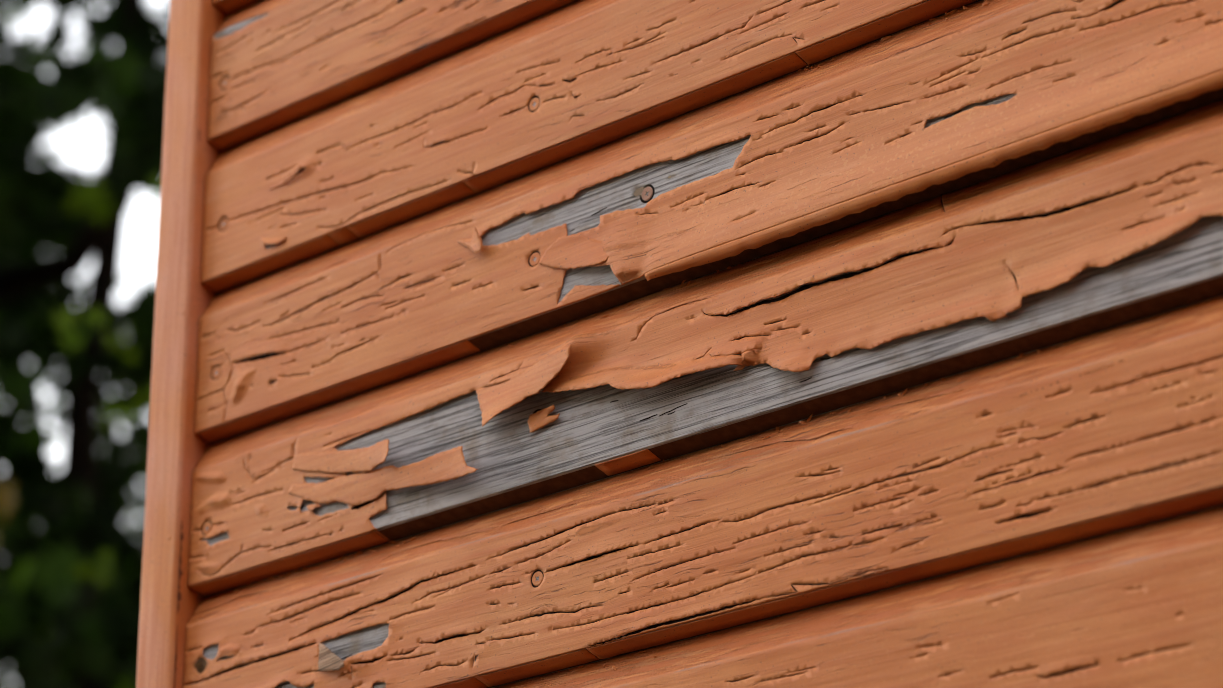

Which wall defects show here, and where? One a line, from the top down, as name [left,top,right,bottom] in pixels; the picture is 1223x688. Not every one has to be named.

crack [198,266,491,404]
crack [206,0,826,230]
peeling [287,220,1223,531]
peeling [457,70,1223,298]
crack [643,0,1223,215]
crack [650,164,1223,340]
crack [185,358,1222,688]
peeling [318,623,390,671]